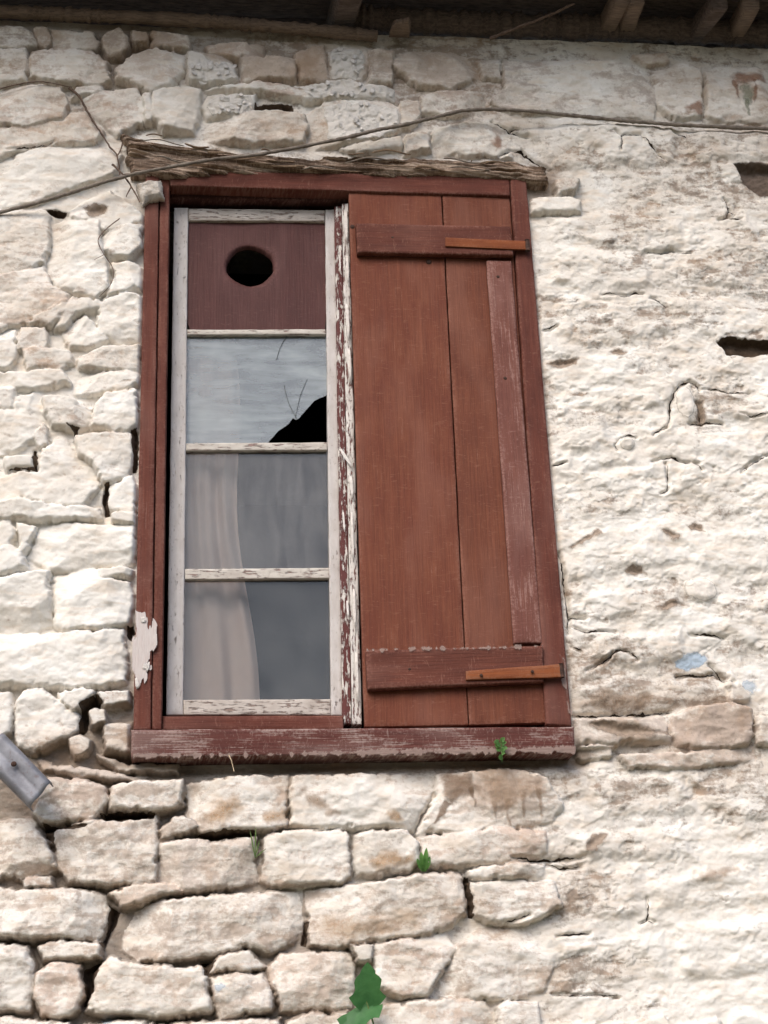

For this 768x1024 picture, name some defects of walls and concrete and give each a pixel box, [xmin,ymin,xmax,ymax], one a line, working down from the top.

crack [495,124,547,171]
spalling [734,162,768,197]
crack [615,383,767,450]
peeling [340,449,353,498]
crack [656,457,703,494]
peeling [342,512,354,562]
peeling [346,589,356,627]
crack [560,562,637,669]
peeling [132,610,157,689]
peeling [268,745,576,757]